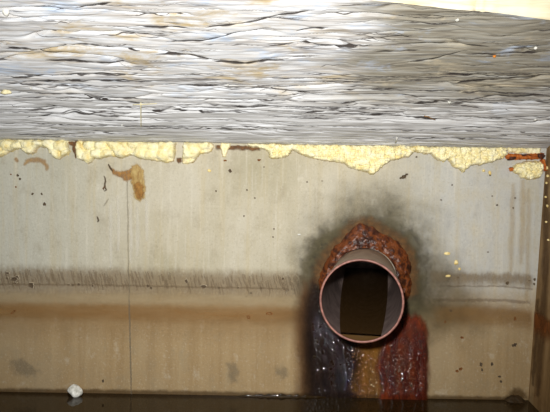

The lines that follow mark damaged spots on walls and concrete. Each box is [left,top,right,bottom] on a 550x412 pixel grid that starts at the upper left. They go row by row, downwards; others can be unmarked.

damp [0,206,426,398]
rust [313,220,415,304]
rust [351,314,428,400]